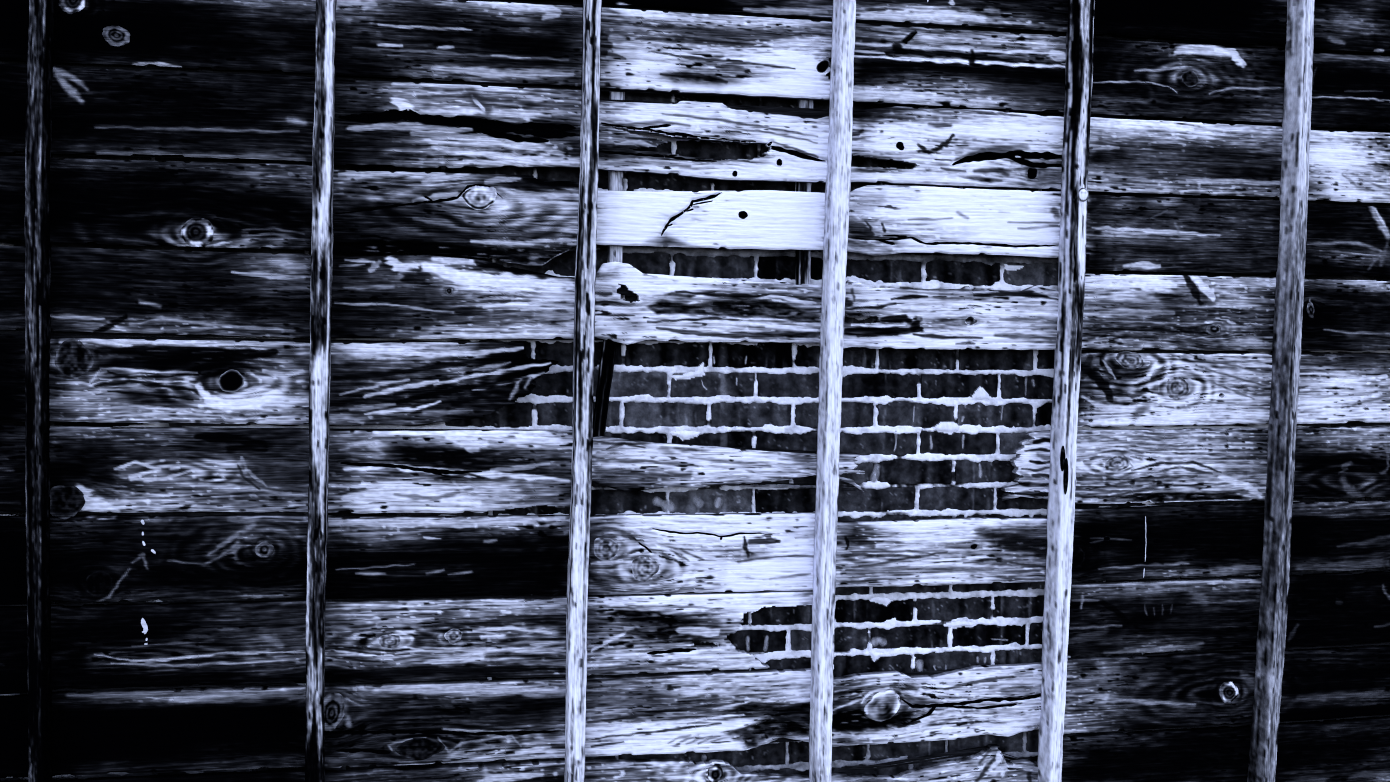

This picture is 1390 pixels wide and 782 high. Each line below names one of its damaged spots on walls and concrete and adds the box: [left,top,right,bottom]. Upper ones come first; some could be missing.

crack [334,109,825,236]